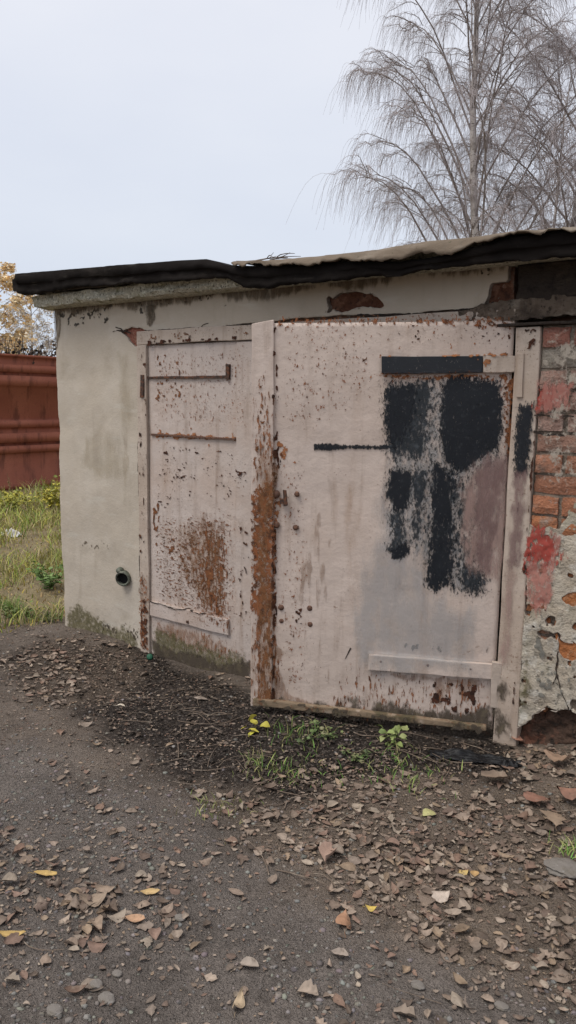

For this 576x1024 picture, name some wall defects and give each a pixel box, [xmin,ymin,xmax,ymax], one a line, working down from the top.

flaking render [325,290,384,316]
flaking render [489,282,514,303]
flaking render [120,326,146,347]
peeling [545,340,576,481]
rust [138,314,514,707]
flaking render [562,591,576,608]
spalling [510,615,576,745]